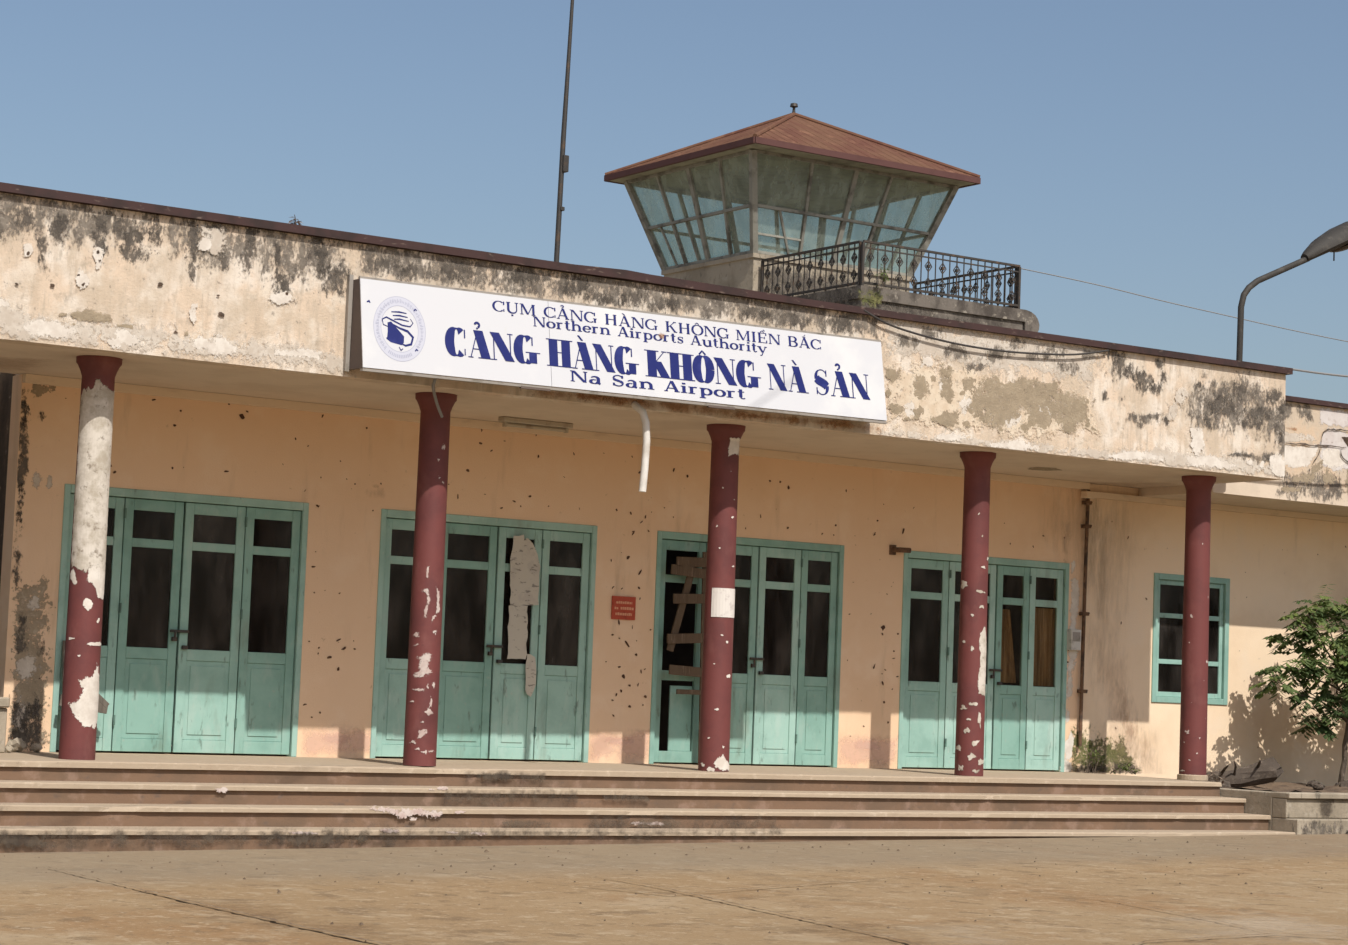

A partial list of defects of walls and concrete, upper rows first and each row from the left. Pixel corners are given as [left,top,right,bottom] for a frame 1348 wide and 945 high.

damp [0,193,1169,428]
damp [12,551,22,587]
damp [8,695,44,751]
damp [16,389,44,526]
damp [15,616,45,655]
peeling [9,576,56,750]
peeling [31,379,116,623]
peeling [68,666,99,729]
peeling [410,567,440,754]
peeling [956,580,986,774]
damp [880,369,1348,502]